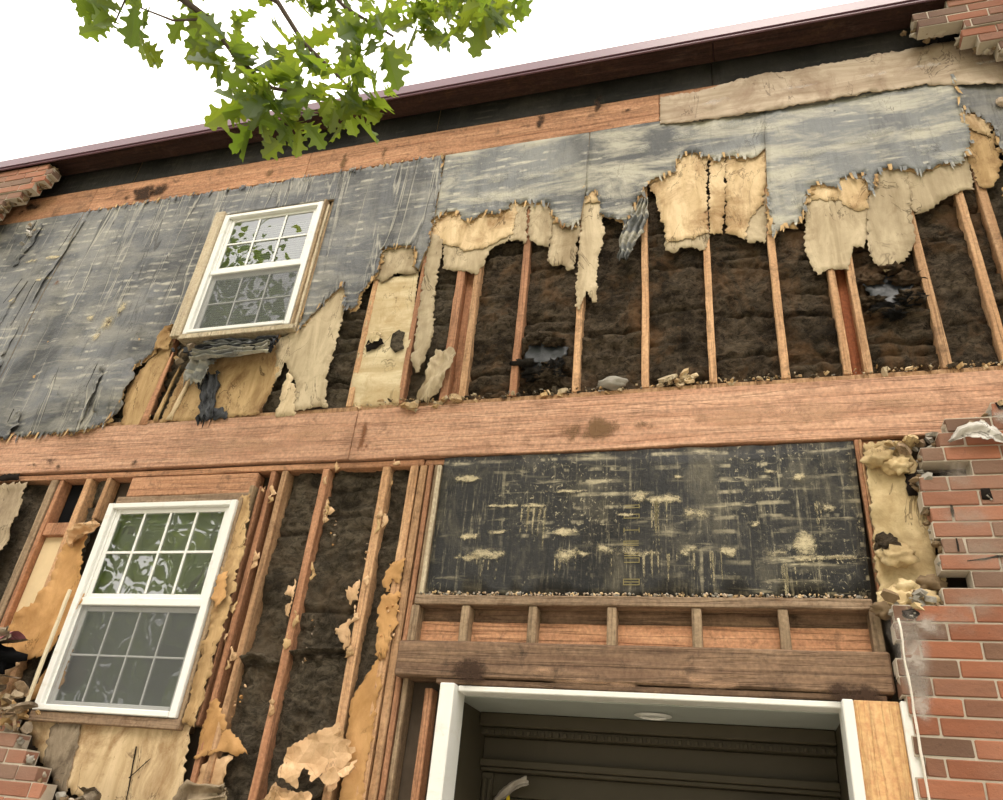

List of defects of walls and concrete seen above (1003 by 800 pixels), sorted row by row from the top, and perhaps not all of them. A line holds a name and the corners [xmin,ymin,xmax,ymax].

peeling [649,149,768,253]
peeling [803,109,1003,275]
peeling [375,186,606,373]
peeling [120,285,345,425]
peeling [0,481,28,550]
damp [456,534,503,570]
damp [489,503,577,544]
damp [554,549,587,570]
damp [625,491,695,578]
damp [709,547,736,580]
crack [950,505,1003,562]
peeling [11,494,251,800]